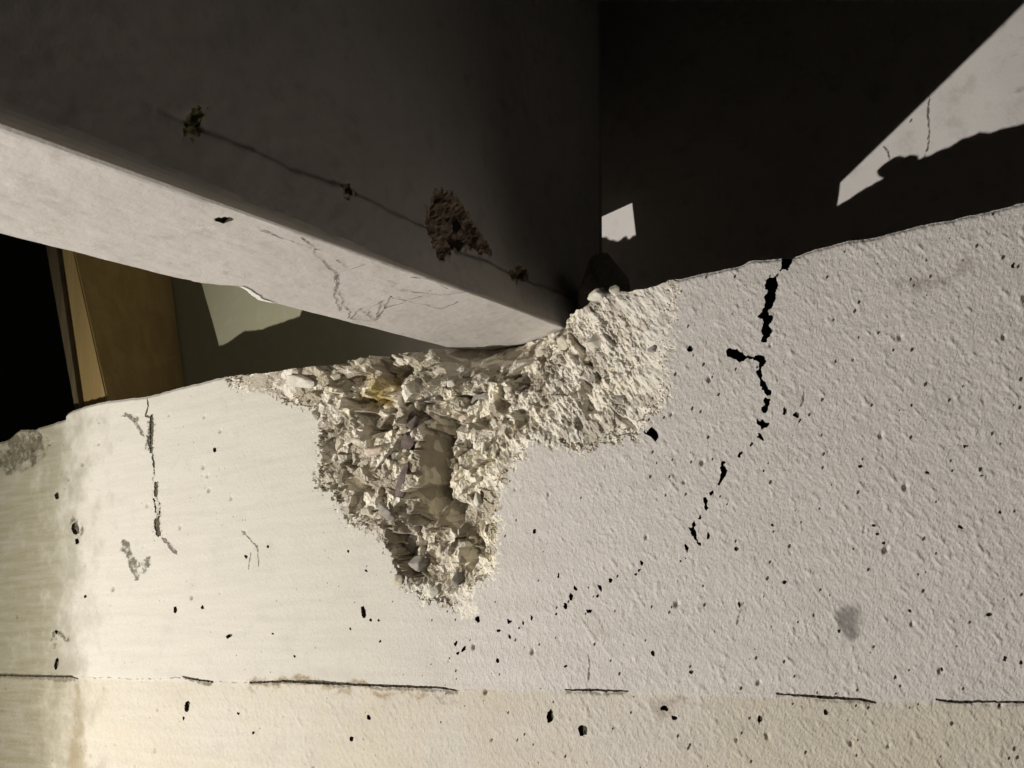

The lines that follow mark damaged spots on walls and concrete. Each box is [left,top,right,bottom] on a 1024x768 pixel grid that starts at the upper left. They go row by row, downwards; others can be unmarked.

crack [261,230,464,322]
spalling [424,186,492,261]
crack [124,400,177,554]
spalling [225,279,690,624]
crack [680,258,794,562]
crack [507,560,643,639]